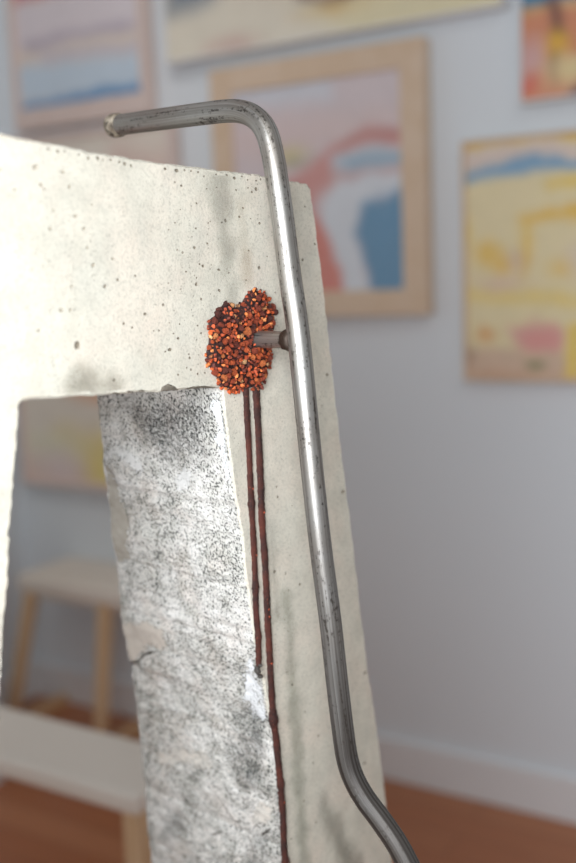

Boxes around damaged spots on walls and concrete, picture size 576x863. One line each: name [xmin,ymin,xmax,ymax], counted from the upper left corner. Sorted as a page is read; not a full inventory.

spalling [104,457,130,569]
corrosion [204,287,290,863]
spalling [122,619,166,662]